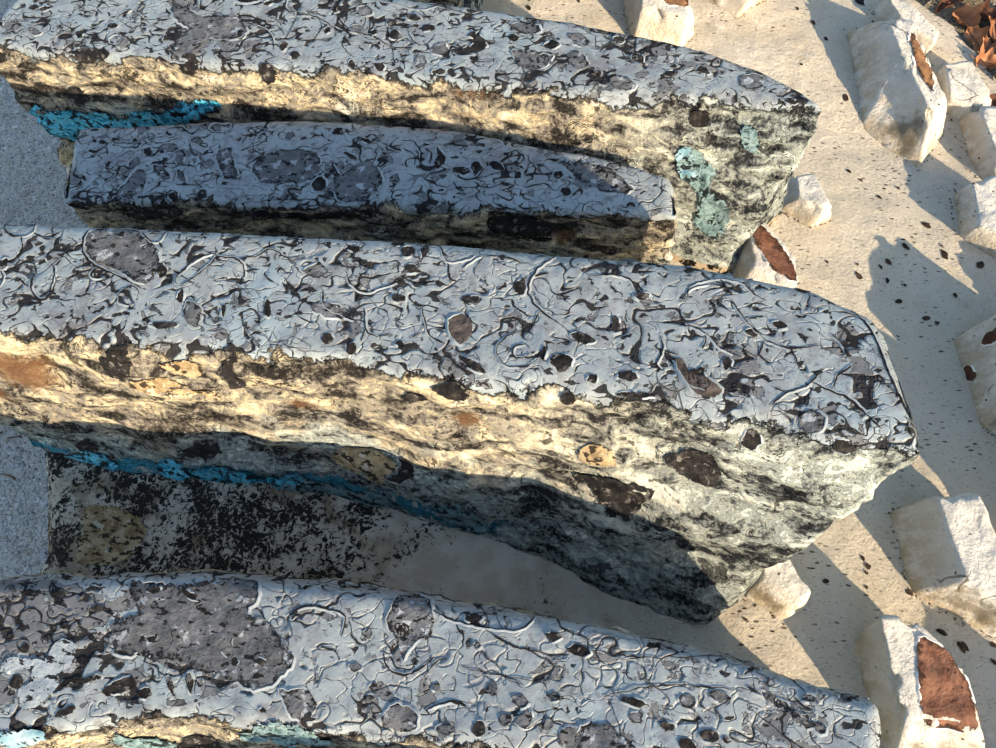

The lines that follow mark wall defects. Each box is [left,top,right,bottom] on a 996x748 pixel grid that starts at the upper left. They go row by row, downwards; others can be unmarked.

peeling [907,32,935,93]
crack [0,224,141,307]
crack [175,241,303,286]
crack [428,245,649,369]
crack [680,278,913,429]
crack [287,605,346,651]
peeling [382,593,437,664]
peeling [545,630,593,659]
crack [425,601,748,662]
peeling [499,695,649,748]
peeling [740,666,830,738]
peeling [915,628,981,734]